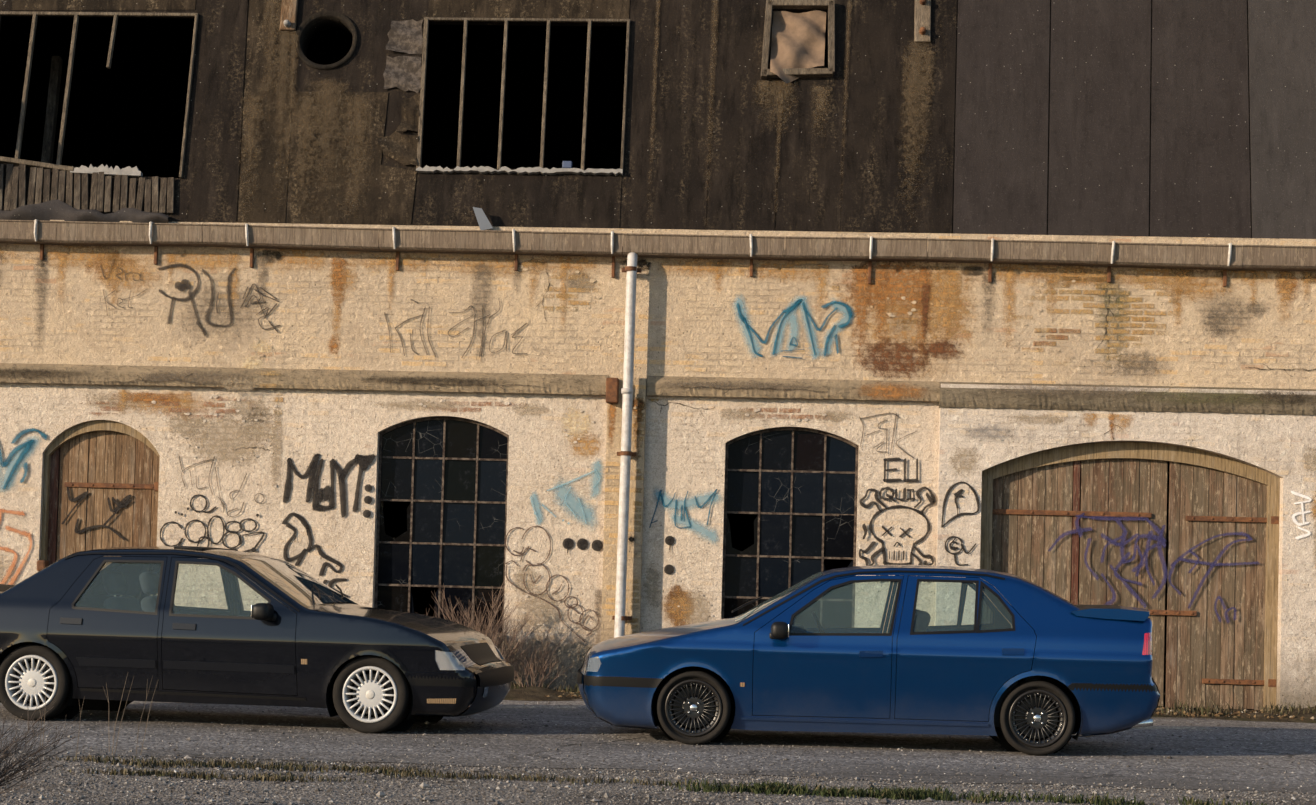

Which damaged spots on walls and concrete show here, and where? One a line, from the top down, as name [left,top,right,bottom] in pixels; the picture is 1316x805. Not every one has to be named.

leakage [36,254,47,329]
rust [48,245,239,302]
rust [269,249,439,351]
rust [661,260,829,305]
rust [846,261,968,377]
rust [983,264,1316,334]
rust [664,585,692,626]